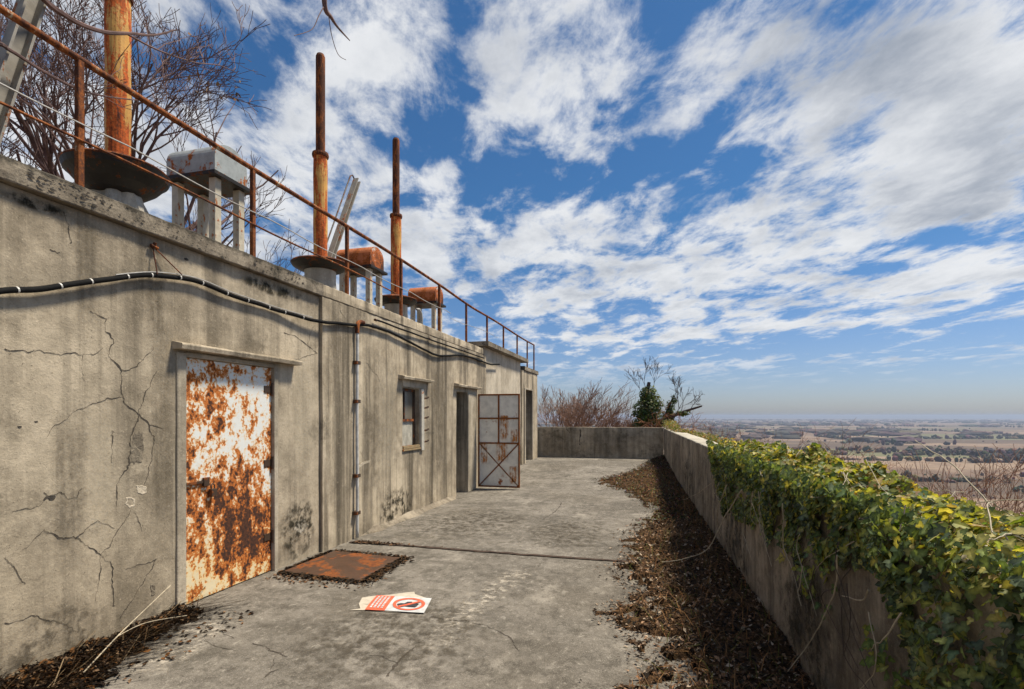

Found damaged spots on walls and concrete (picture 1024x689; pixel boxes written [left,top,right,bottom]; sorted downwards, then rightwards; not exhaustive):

crack [5,311,160,616]
rust [481,415,517,482]
water stain [285,506,312,553]
water stain [381,491,410,522]